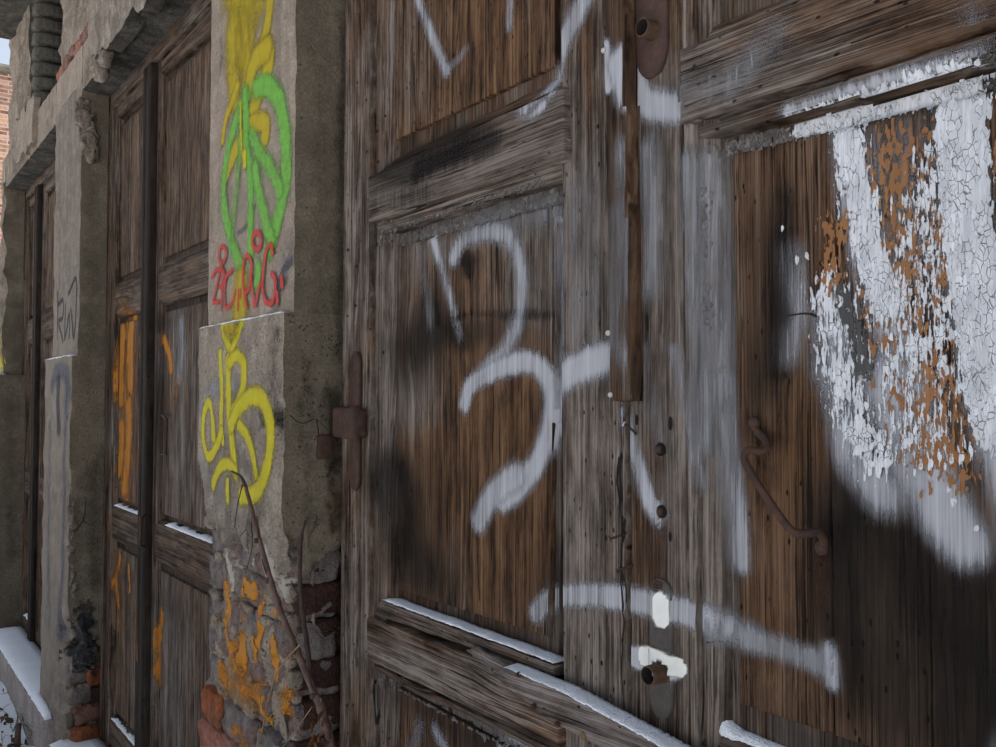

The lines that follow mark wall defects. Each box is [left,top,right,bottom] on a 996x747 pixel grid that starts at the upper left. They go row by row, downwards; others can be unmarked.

peeling [696,53,996,508]
spalling [197,516,341,747]